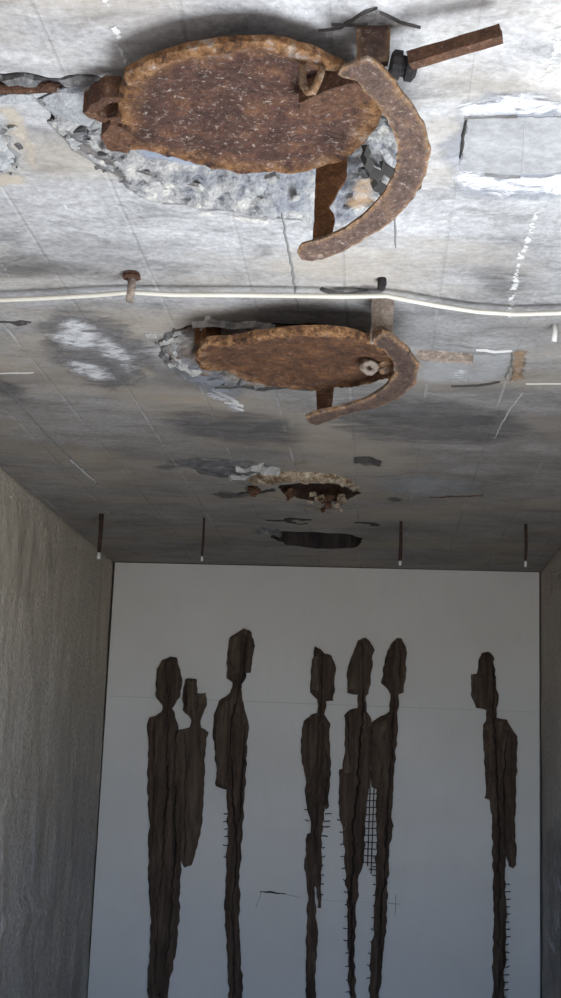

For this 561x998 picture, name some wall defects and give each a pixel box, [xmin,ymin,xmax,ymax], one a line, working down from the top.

spalling [40,85,316,225]
spalling [329,118,398,225]
damp [39,311,153,389]
spalling [145,316,317,396]